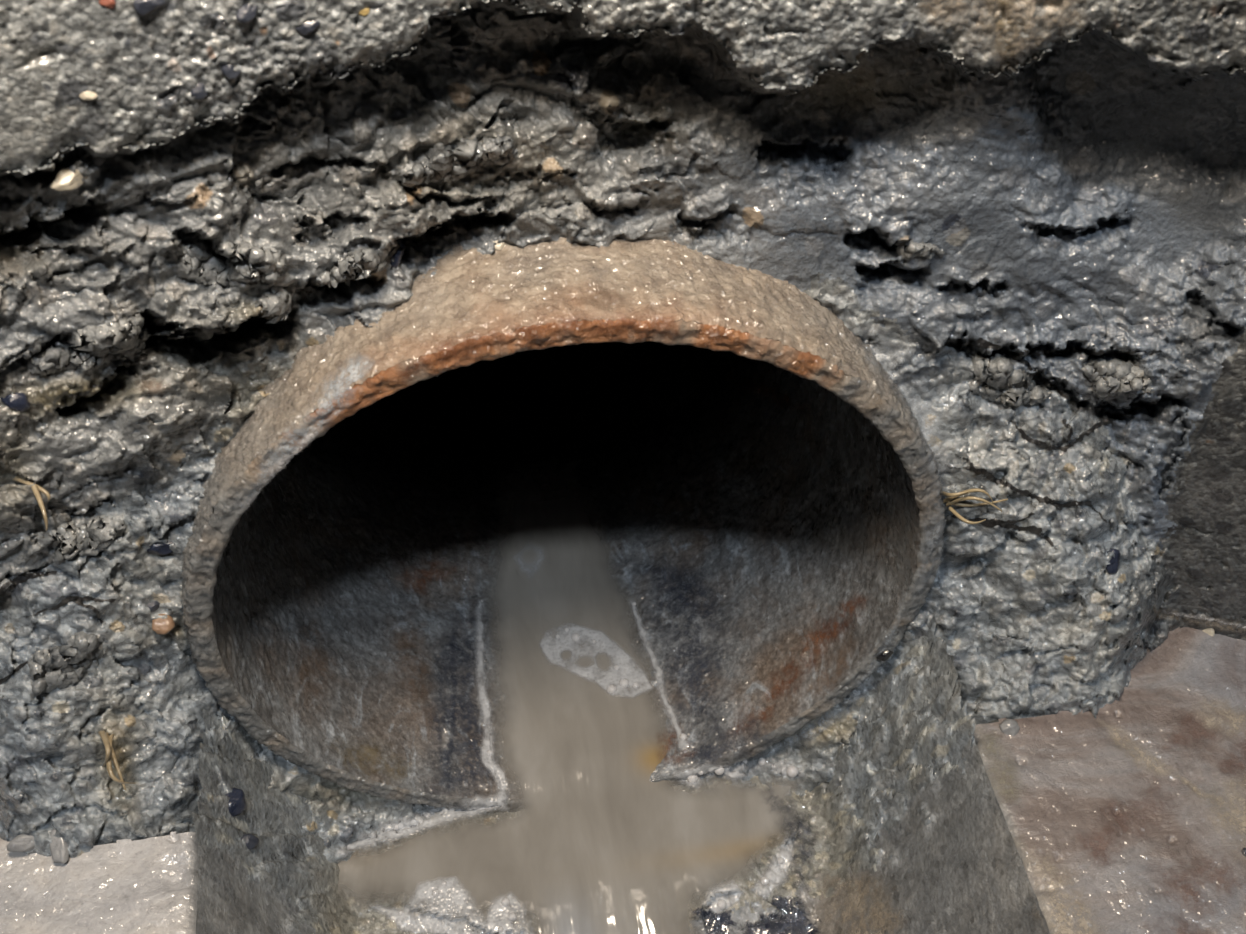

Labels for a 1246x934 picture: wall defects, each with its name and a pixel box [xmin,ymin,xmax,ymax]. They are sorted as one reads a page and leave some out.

spalling [0,0,1246,592]
corrosion [399,334,501,378]
crack [944,338,1189,452]
crack [941,454,1108,549]
spalling [27,631,103,700]
leakage [434,638,491,789]
leakage [649,568,720,714]
leakage [691,906,736,934]